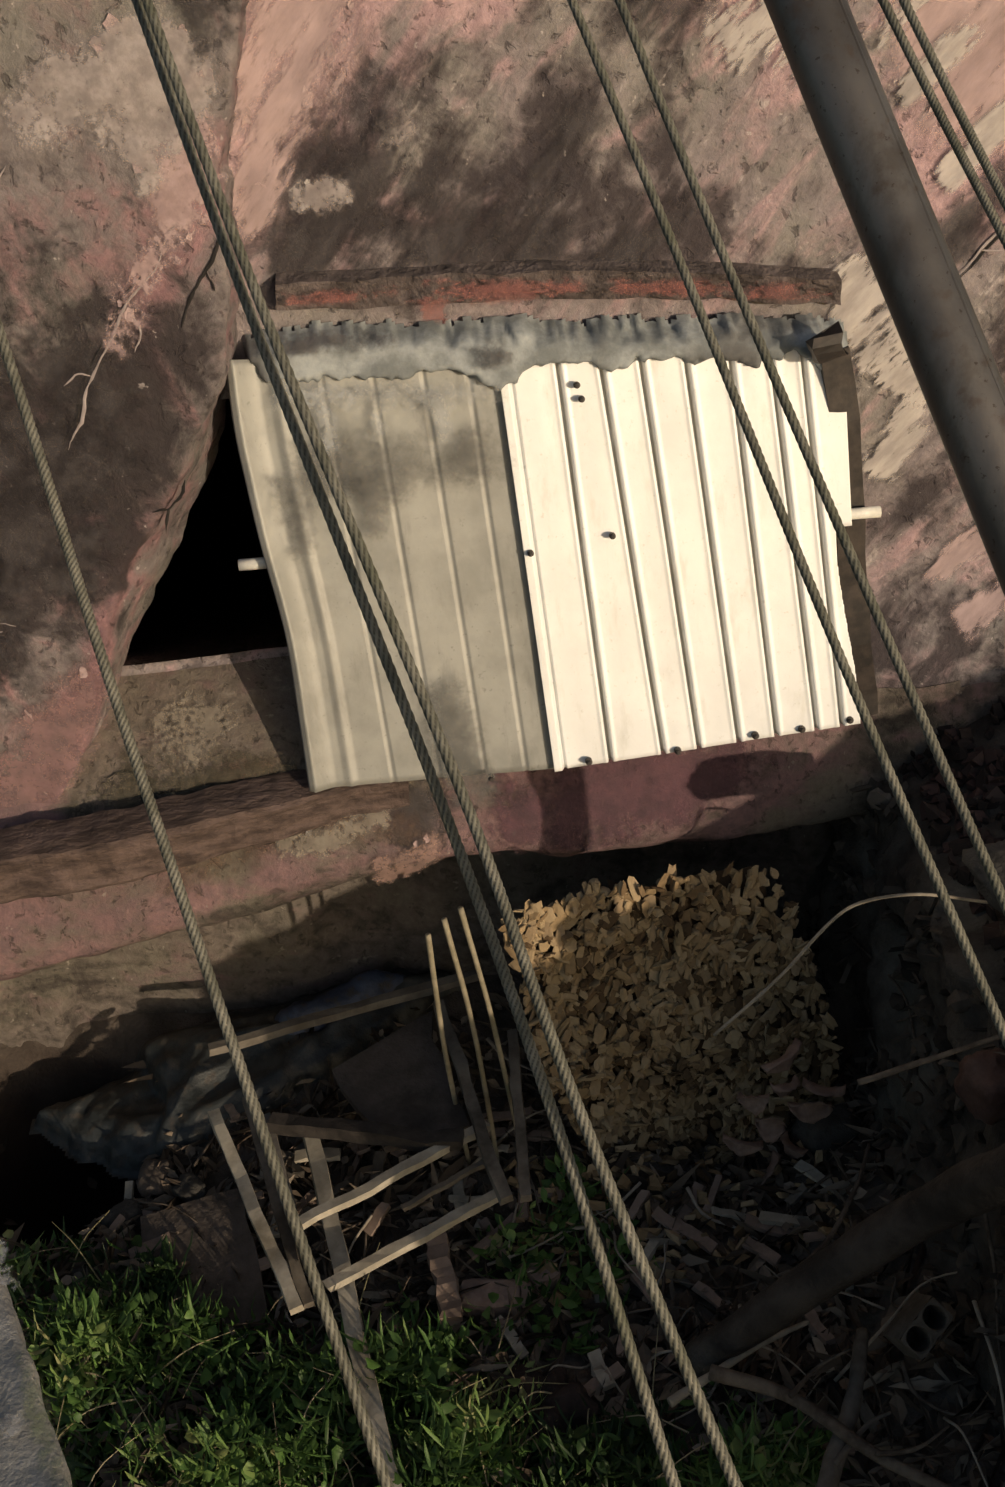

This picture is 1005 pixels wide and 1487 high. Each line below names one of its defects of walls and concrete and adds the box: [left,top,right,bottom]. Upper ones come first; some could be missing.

leakage [291,178,353,213]
crack [181,241,219,328]
crack [63,226,175,450]